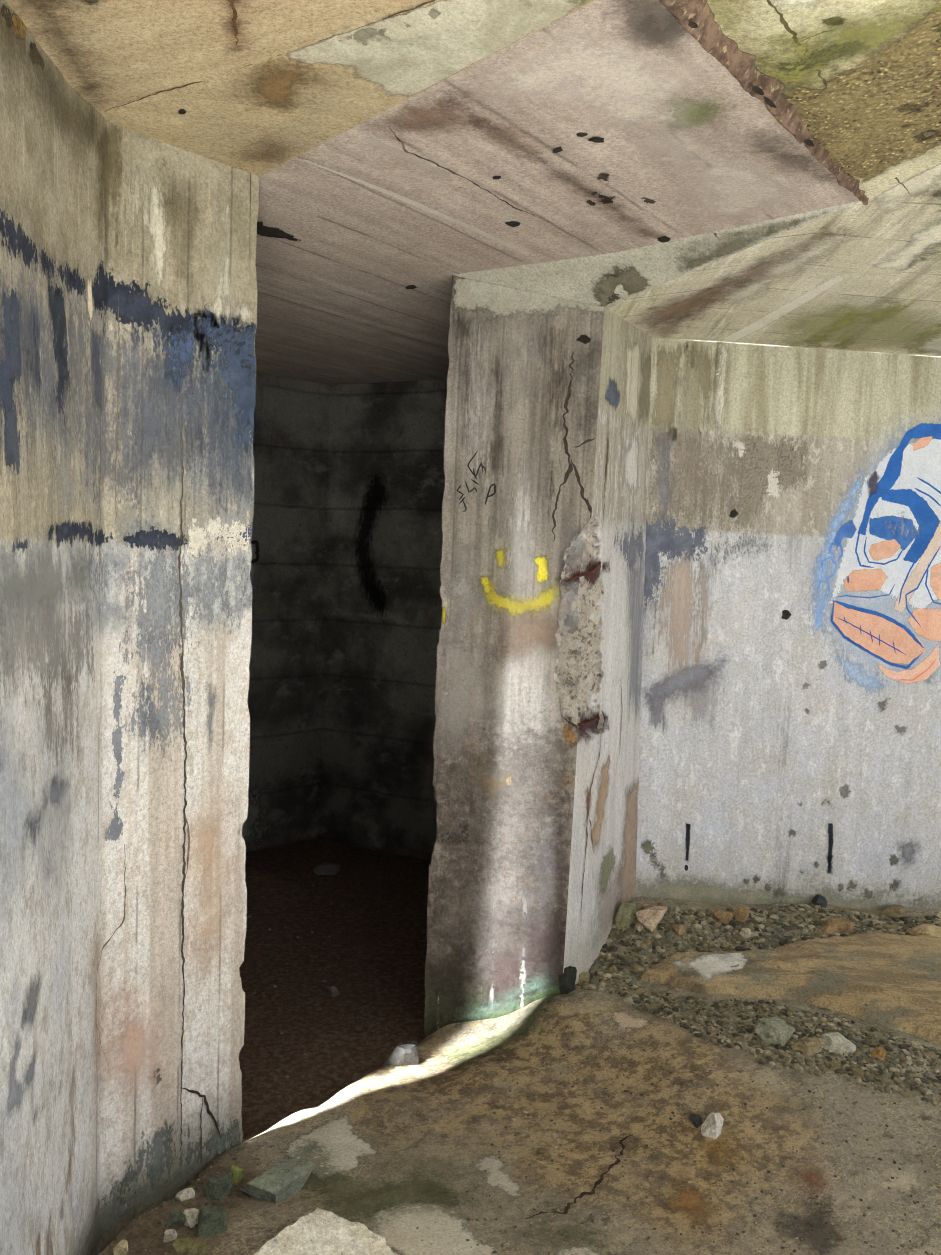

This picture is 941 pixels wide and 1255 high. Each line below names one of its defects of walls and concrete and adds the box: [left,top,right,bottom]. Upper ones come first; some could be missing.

rust [227,0,241,50]
crack [318,0,435,42]
crack [766,0,833,40]
damp [725,236,845,302]
damp [875,221,941,269]
crack [551,352,595,542]
rust [561,559,610,587]
spalling [554,515,605,744]
rust [563,711,609,743]
crack [178,397,222,1170]
damp [428,894,564,1030]
crack [526,1134,633,1219]